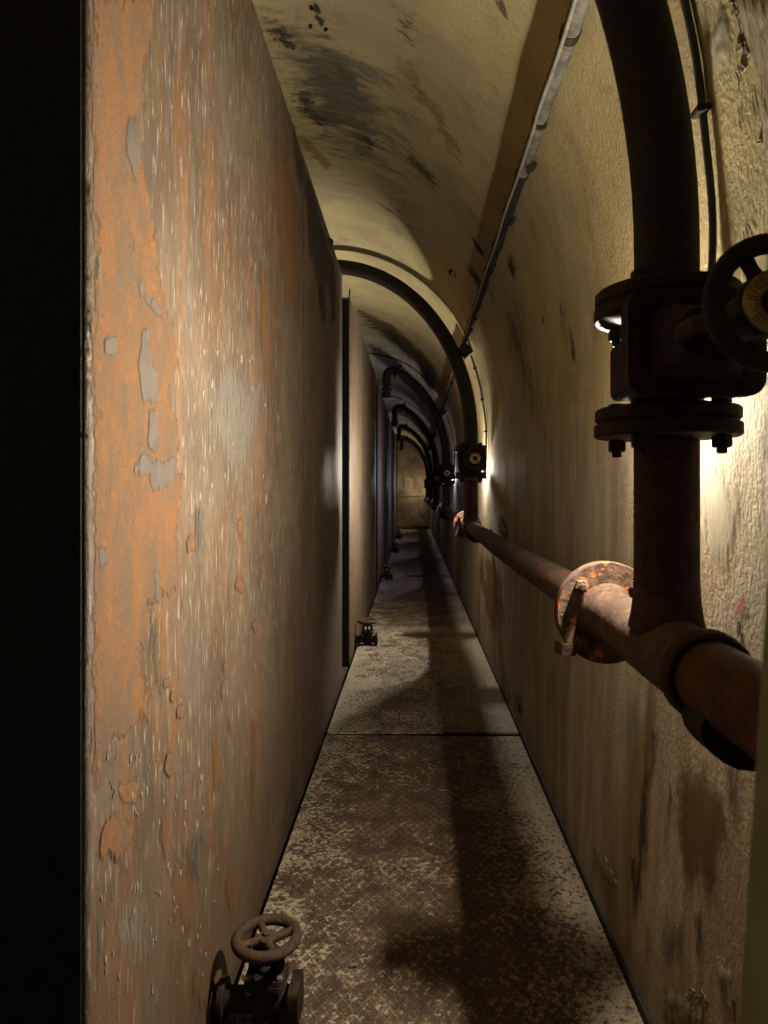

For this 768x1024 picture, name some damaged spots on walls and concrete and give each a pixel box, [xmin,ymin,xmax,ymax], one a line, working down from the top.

leakage [265,19,397,322]
rust [88,0,195,794]
rust [100,779,140,862]